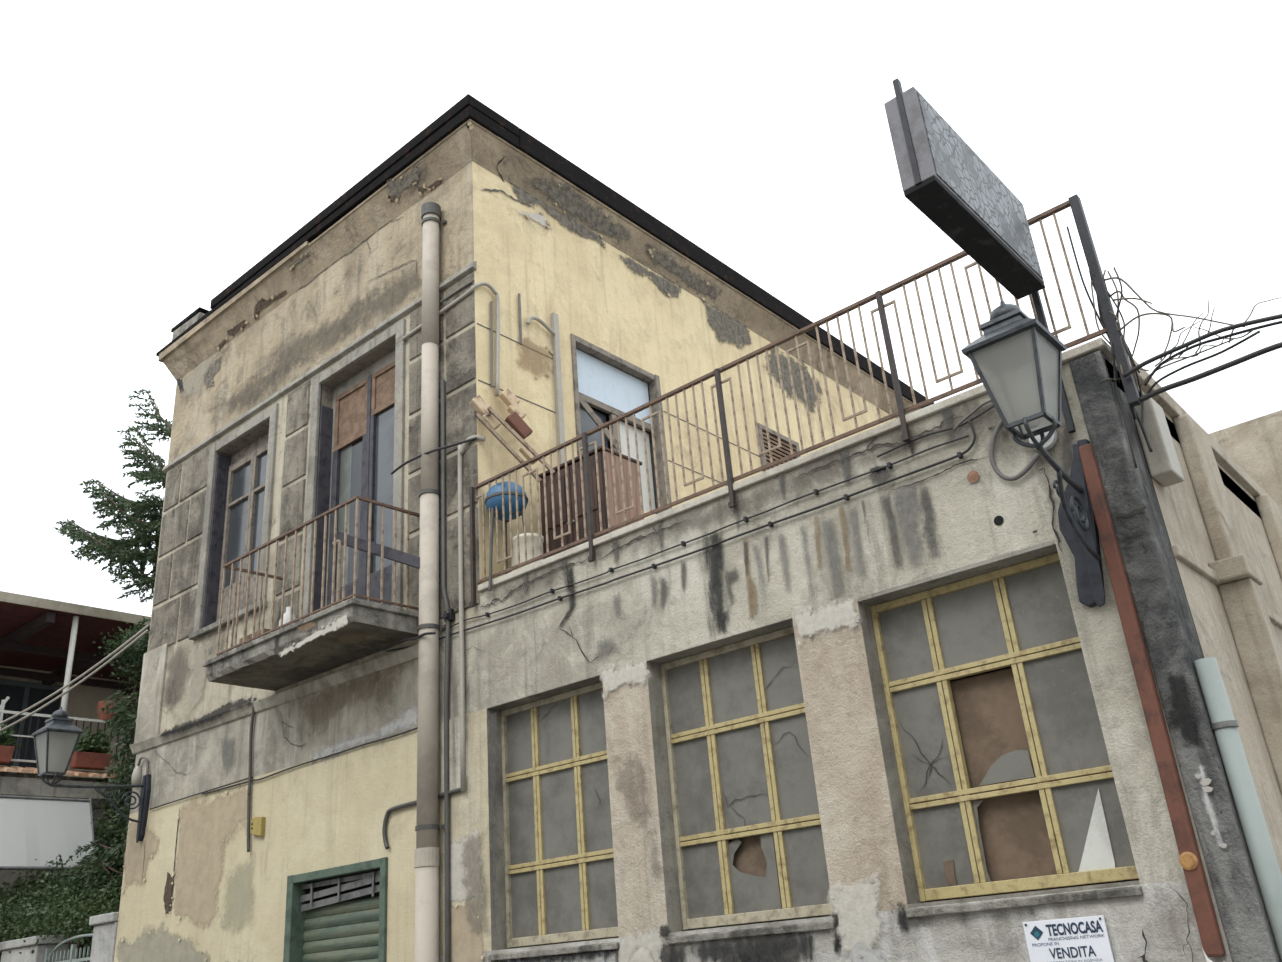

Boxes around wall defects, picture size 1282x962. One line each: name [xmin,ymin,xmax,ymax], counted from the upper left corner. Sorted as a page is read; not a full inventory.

leakage [870,466,889,482]
leakage [882,487,937,565]
leakage [652,579,666,606]
leakage [703,533,737,633]
leakage [779,534,789,586]
crack [559,617,599,663]
leakage [312,707,418,763]
spalling [162,872,174,914]
peeling [443,828,484,962]
leakage [660,925,813,962]
leakage [832,913,884,962]
crack [1138,929,1148,962]